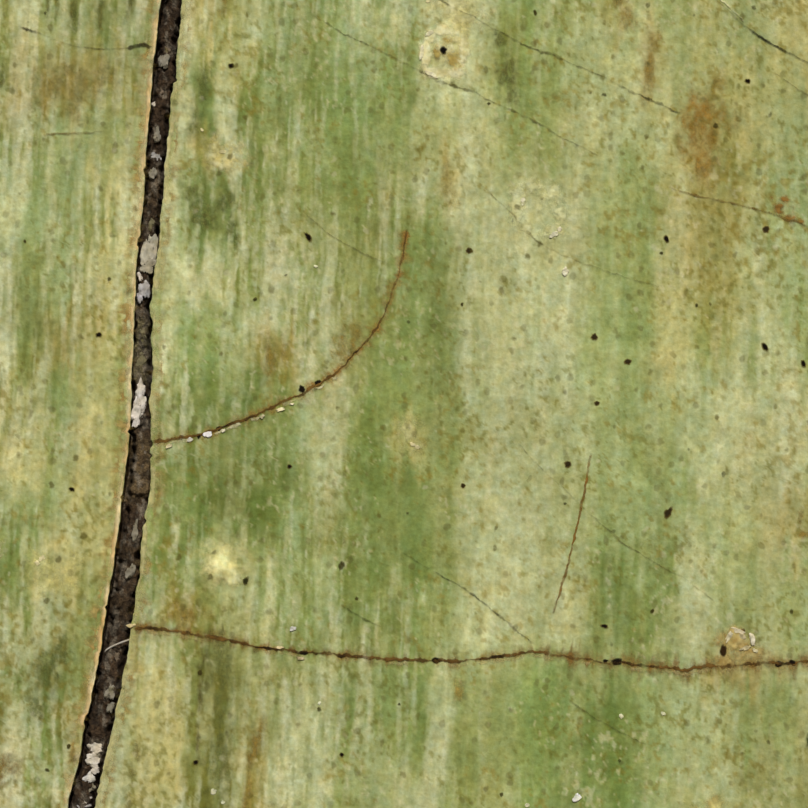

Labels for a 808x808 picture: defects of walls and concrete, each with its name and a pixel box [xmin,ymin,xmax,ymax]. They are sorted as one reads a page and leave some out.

crack [721,0,786,52]
crack [65,0,549,808]
crack [557,648,808,677]